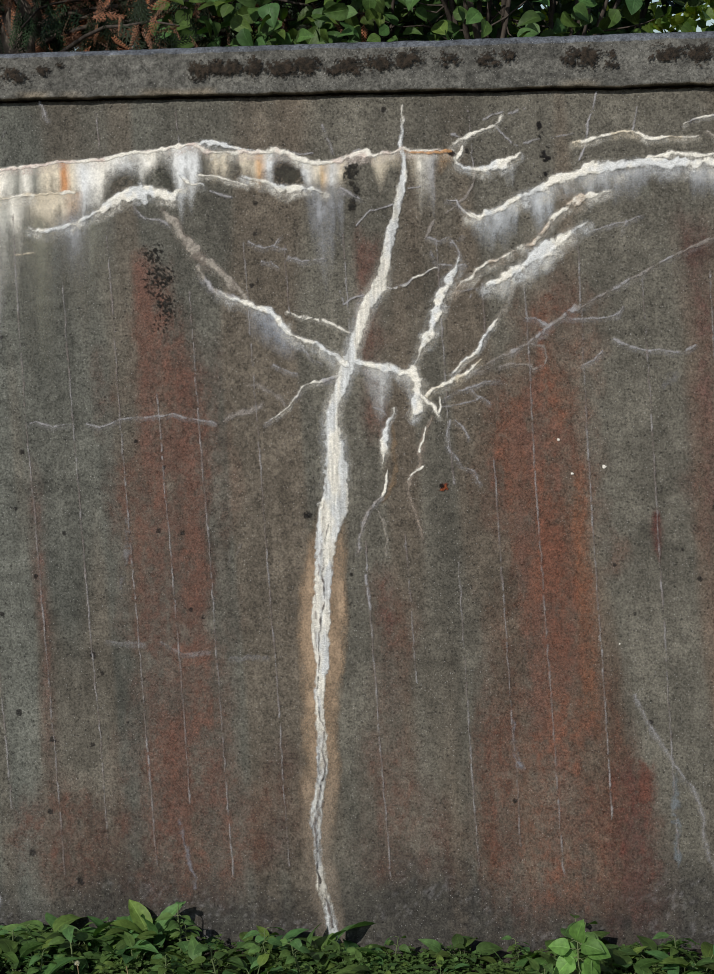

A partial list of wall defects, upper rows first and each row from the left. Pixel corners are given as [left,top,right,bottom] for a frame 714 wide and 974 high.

damp [0,91,714,304]
crack [86,105,714,944]
damp [299,536,347,942]